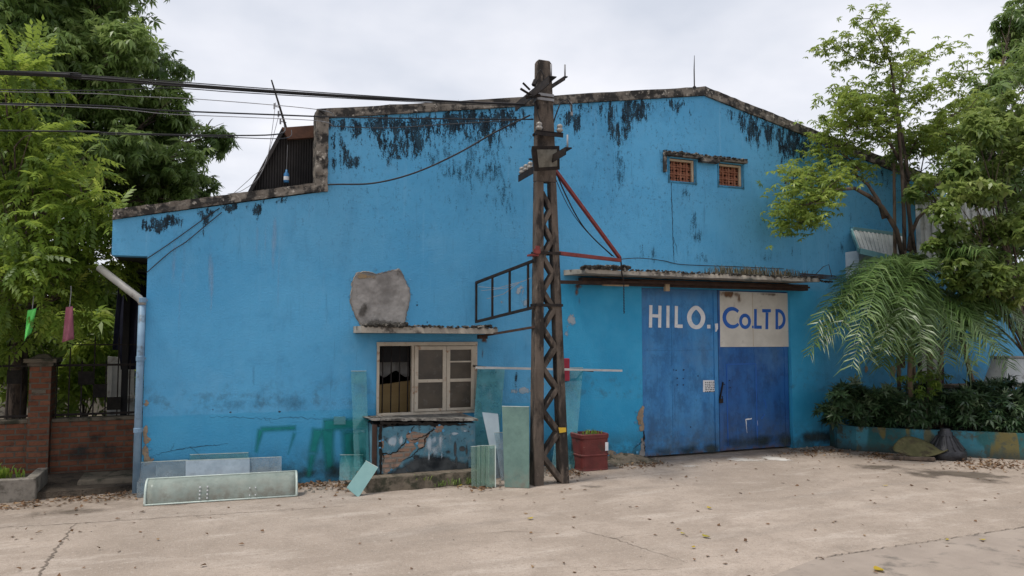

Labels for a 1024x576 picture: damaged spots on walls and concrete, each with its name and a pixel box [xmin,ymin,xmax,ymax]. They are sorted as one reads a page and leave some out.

damp [329,108,534,212]
damp [554,98,692,188]
damp [141,215,183,234]
damp [197,197,288,237]
flaking render [349,266,418,326]
peeling [142,426,154,465]
flaking render [379,424,445,475]